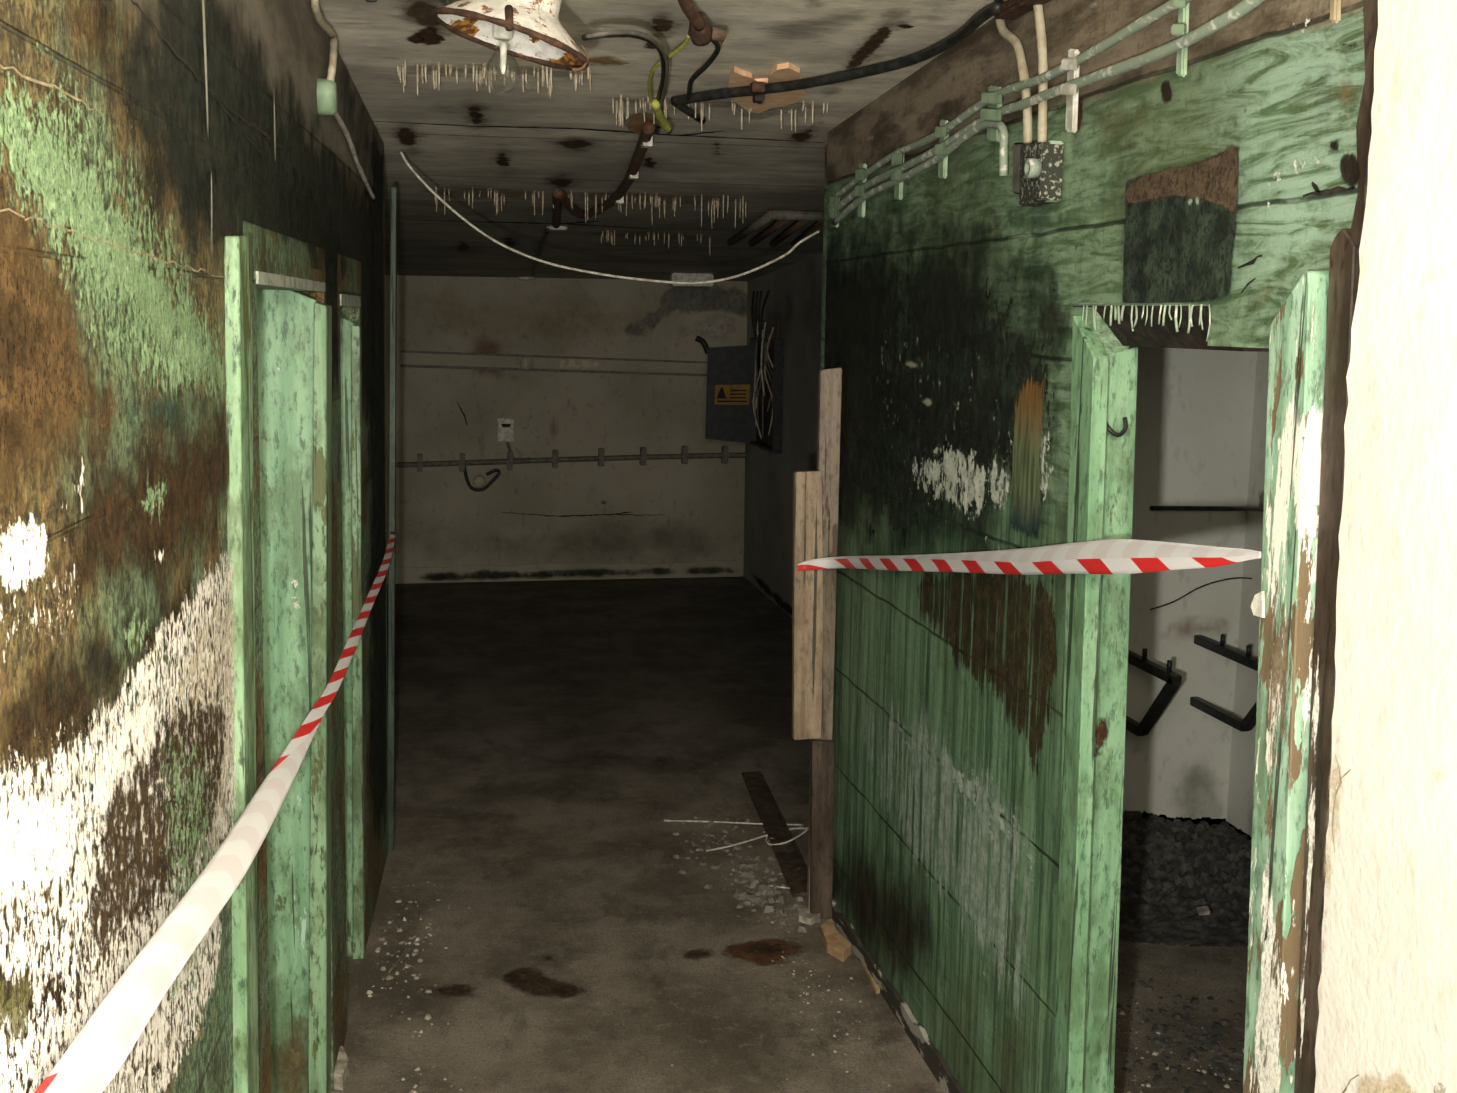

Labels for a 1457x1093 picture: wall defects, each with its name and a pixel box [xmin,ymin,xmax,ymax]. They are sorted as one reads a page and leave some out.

damp [1122,145,1239,303]
damp [0,205,230,768]
peeling [877,339,949,424]
peeling [904,357,1013,550]
damp [918,571,1057,779]
peeling [1311,654,1319,755]
damp [0,675,226,1093]
damp [504,957,577,997]
peeling [1254,603,1294,1093]
peeling [1300,778,1316,1057]
peeling [1360,1074,1412,1093]